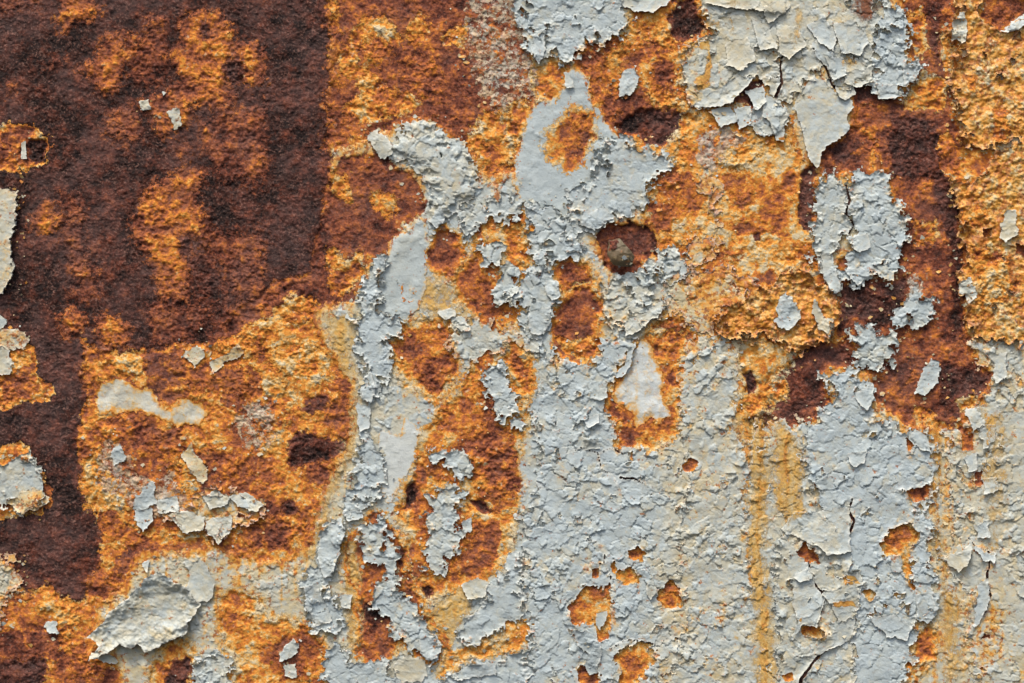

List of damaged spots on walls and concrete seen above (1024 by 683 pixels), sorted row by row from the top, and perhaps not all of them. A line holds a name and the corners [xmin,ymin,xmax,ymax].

peeling [86,560,216,664]
peeling [95,439,267,545]
corrosion [0,0,566,683]
peeling [298,0,1024,683]
corrosion [537,0,995,683]
corrosion [974,413,1009,522]